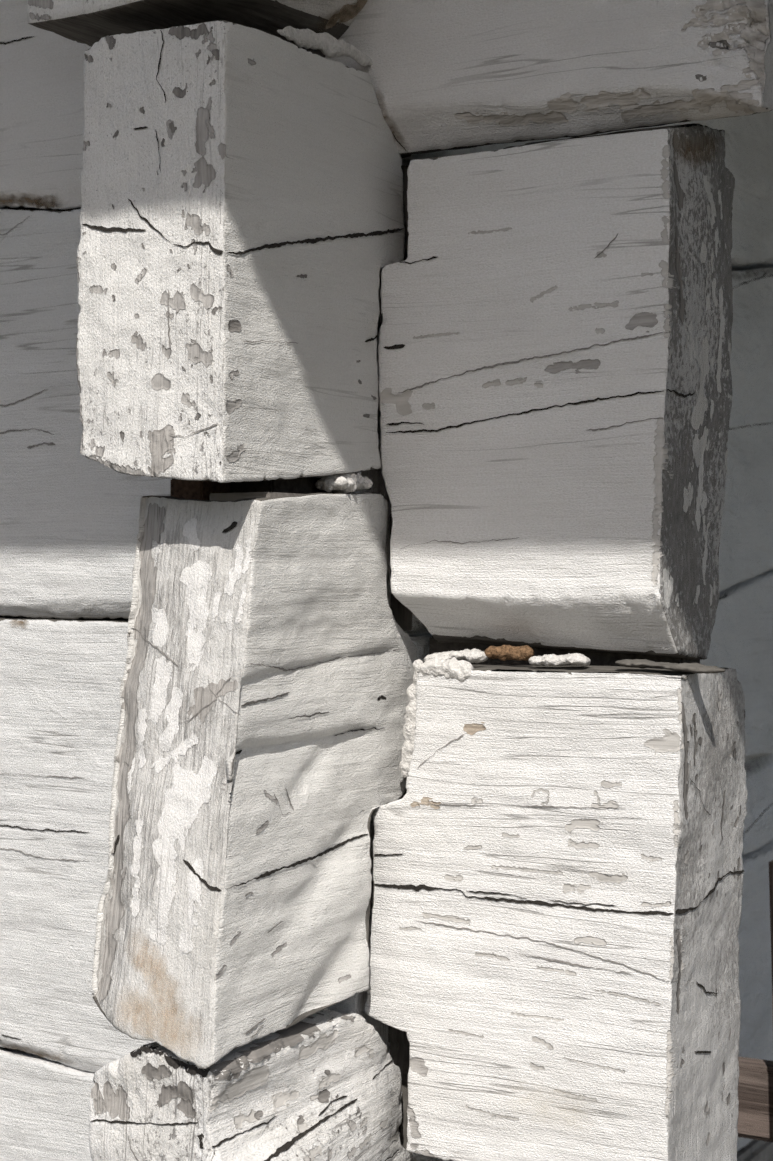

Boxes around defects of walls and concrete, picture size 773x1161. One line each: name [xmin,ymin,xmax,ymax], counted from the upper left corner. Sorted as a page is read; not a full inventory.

peeling [181,78,233,193]
crack [81,199,404,255]
peeling [160,283,222,320]
crack [400,332,667,393]
peeling [76,336,216,477]
crack [386,389,695,433]
peeling [180,518,253,671]
crack [183,834,403,896]
crack [373,802,773,915]
crack [416,920,717,994]
peeling [91,1081,130,1121]
peeling [130,1011,354,1133]